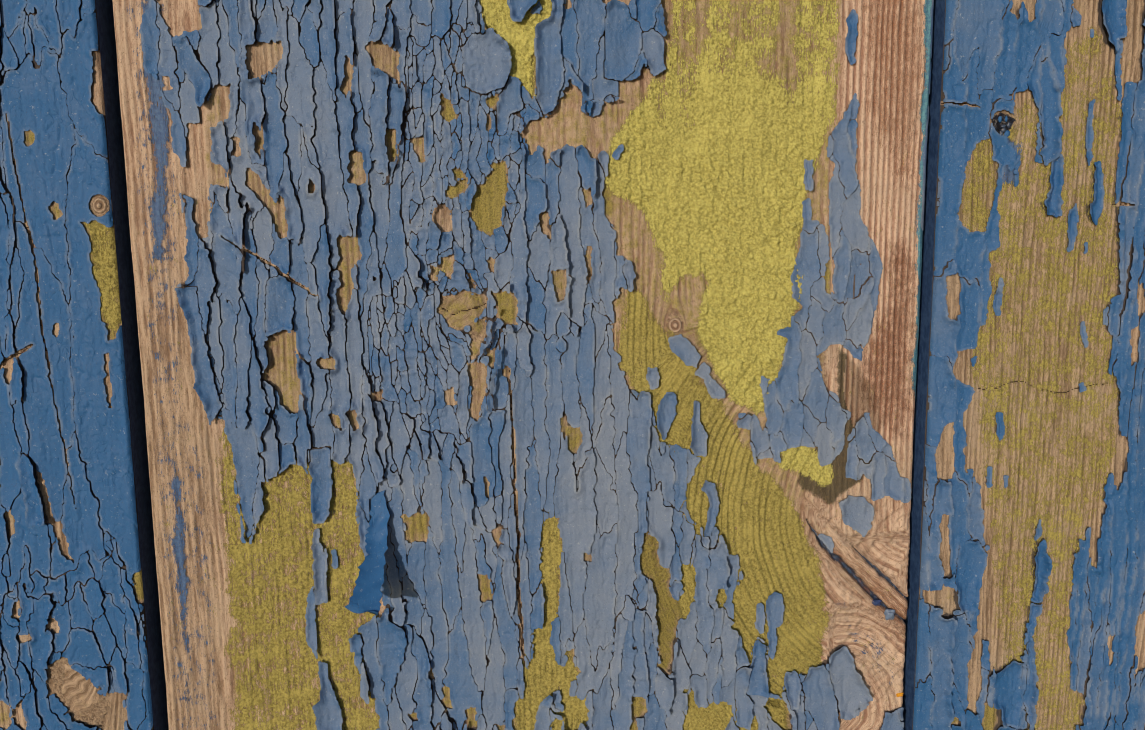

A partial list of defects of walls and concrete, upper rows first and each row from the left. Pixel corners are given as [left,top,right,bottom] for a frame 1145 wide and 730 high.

crack [2,113,75,500]
peeling [0,0,153,730]
crack [509,370,525,679]
peeling [113,0,934,730]
peeling [913,0,1145,730]